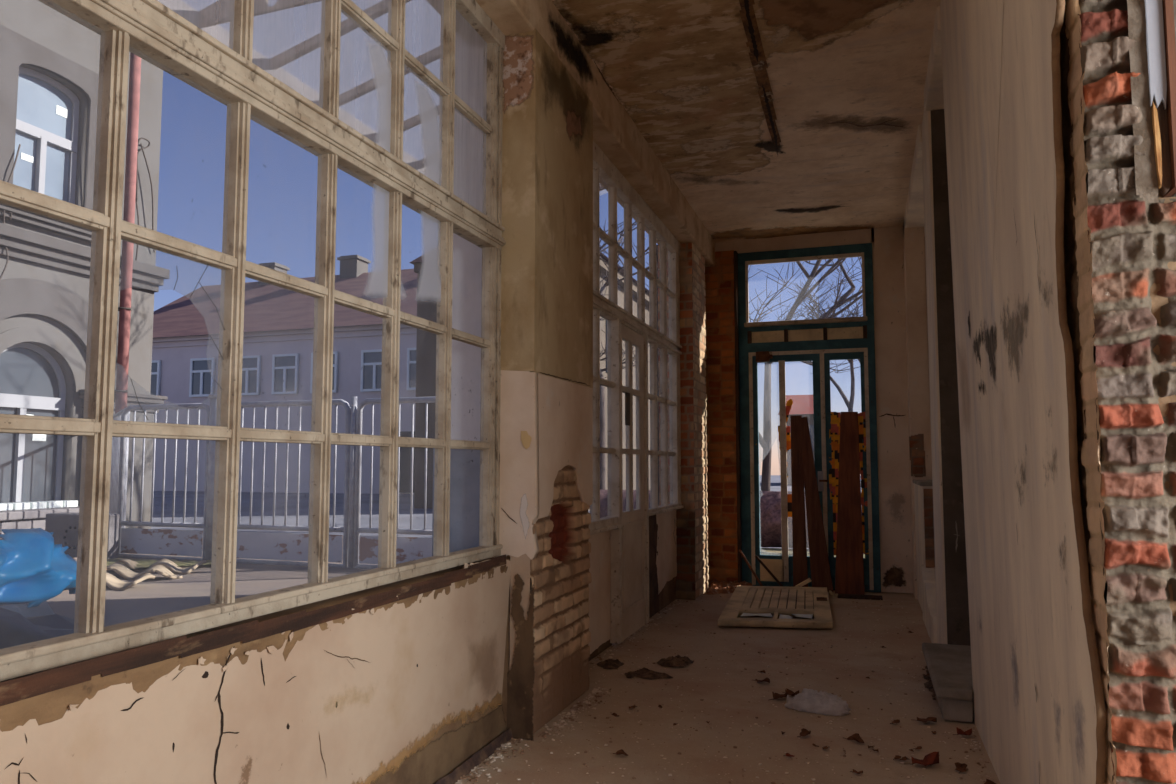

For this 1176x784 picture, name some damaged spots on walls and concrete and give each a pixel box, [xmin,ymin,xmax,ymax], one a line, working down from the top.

water stain [502,9,617,142]
peeling [553,0,911,177]
water stain [968,302,1028,394]
peeling [0,465,592,734]
crack [214,646,239,784]